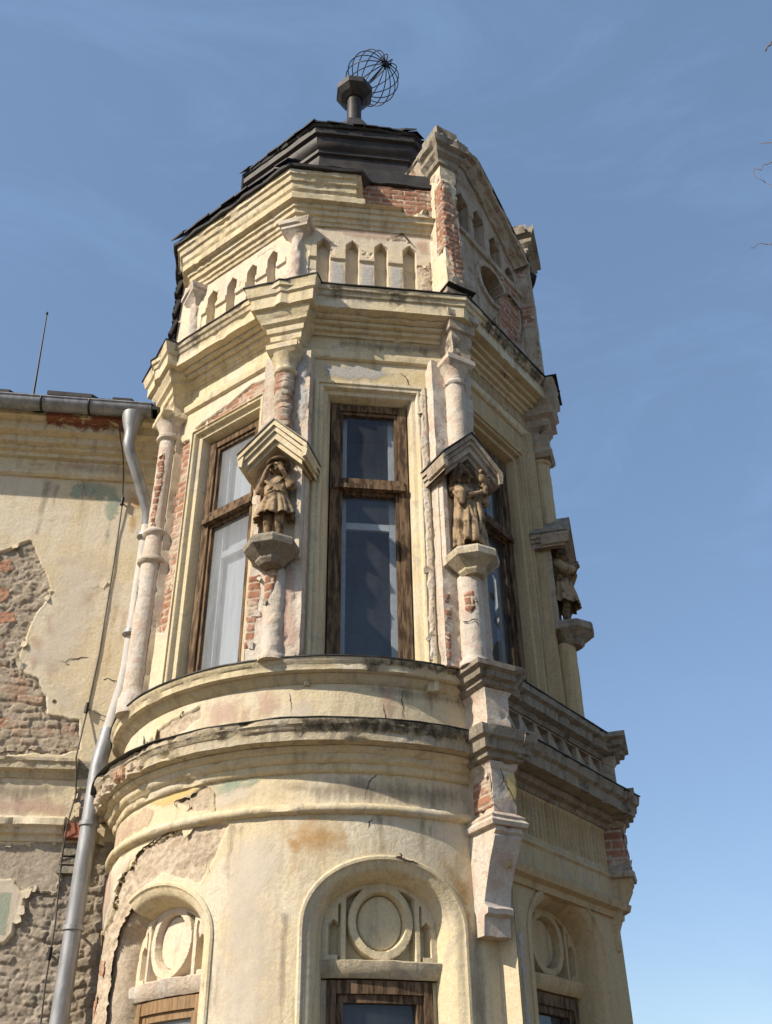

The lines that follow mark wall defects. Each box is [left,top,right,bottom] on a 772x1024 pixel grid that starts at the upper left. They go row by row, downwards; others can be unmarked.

spalling [363,174,465,291]
spalling [0,542,80,756]
spalling [0,760,144,1024]
spalling [68,778,259,1024]
water stain [295,718,467,740]
spalling [471,771,494,816]